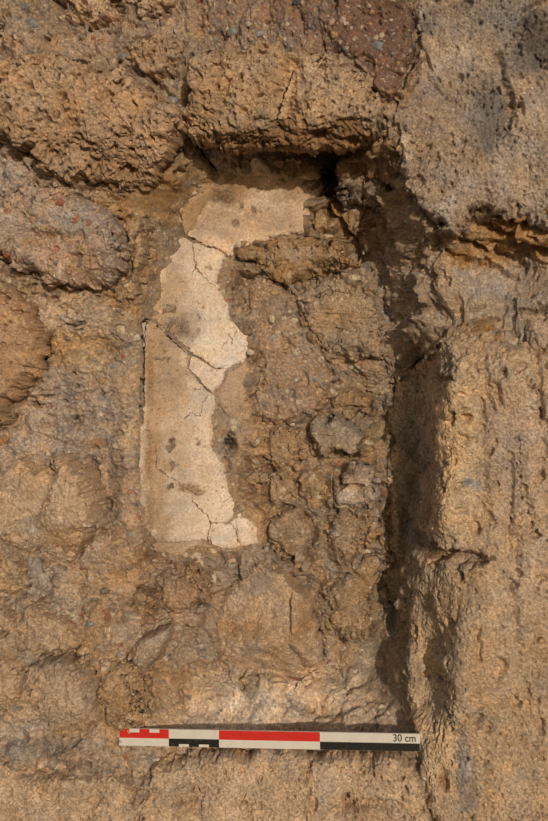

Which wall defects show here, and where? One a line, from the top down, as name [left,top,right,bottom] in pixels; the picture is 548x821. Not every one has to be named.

crack [188,236,226,285]
crack [139,319,237,432]
flaking render [139,156,324,566]
crack [155,447,238,542]